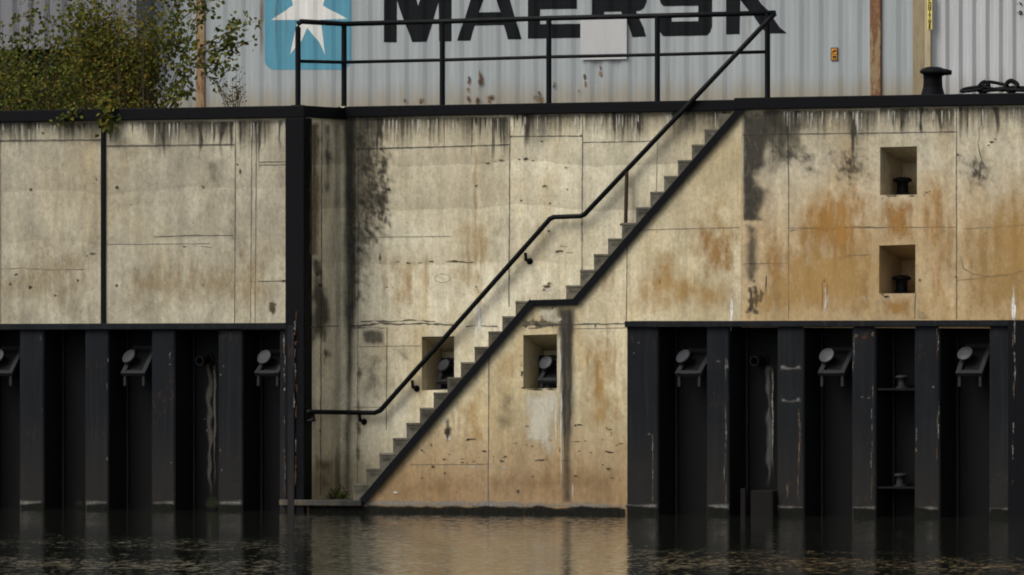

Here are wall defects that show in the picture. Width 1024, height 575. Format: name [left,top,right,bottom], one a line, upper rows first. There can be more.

leakage [0,121,284,154]
corrosion [467,71,493,104]
leakage [345,111,731,389]
leakage [744,107,1024,314]
leakage [365,307,608,507]